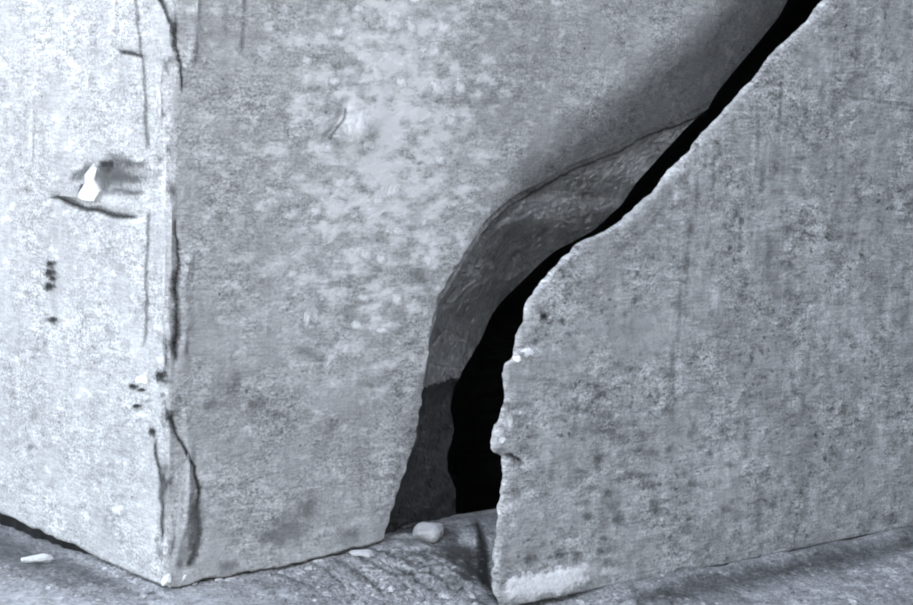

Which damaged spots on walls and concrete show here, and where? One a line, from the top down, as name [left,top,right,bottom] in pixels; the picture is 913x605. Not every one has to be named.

crack [118,0,148,145]
crack [158,0,183,90]
spalling [51,157,145,219]
crack [142,215,150,341]
crack [169,220,181,360]
crack [384,0,822,605]
crack [154,411,202,566]